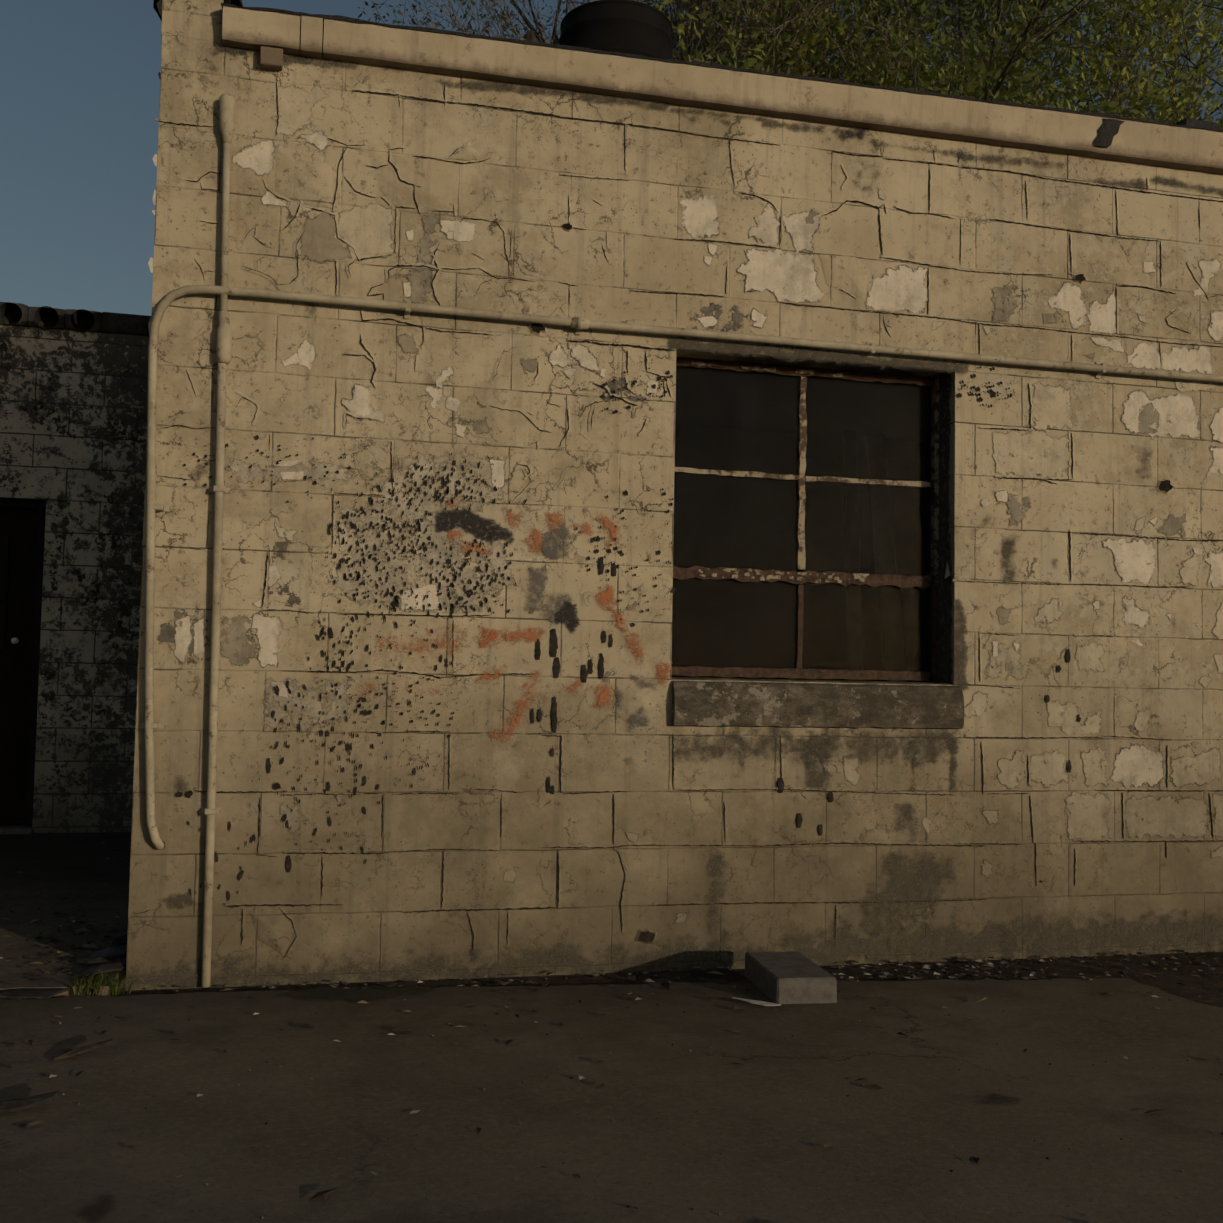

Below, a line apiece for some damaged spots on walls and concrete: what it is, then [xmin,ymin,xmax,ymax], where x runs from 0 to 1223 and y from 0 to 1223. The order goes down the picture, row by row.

crack [155,118,215,127]
crack [275,77,283,138]
peeling [232,84,330,176]
crack [352,84,784,297]
crack [185,135,676,501]
peeling [690,202,825,332]
peeling [865,264,928,313]
peeling [1043,274,1223,481]
peeling [157,366,527,864]
peeling [1102,513,1223,646]
leakage [673,727,958,831]
peeling [997,700,1223,858]